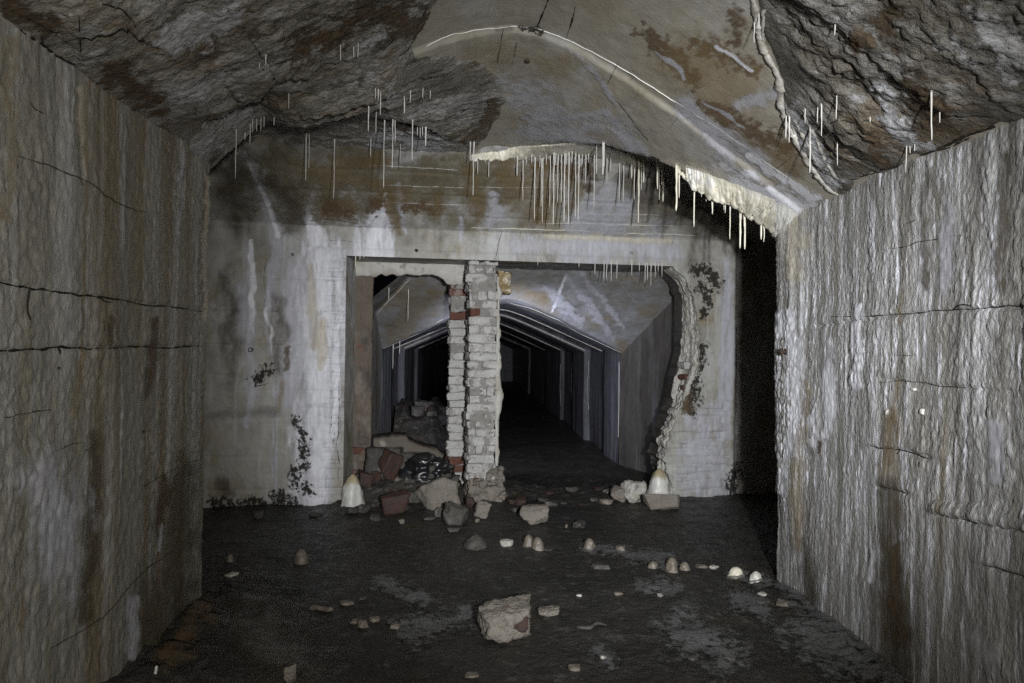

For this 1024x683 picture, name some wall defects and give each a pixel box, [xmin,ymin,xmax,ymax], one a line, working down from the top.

crack [18,156,146,212]
damp [661,90,822,278]
crack [0,282,203,320]
damp [202,58,749,508]
crack [829,304,1022,317]
crack [0,345,192,354]